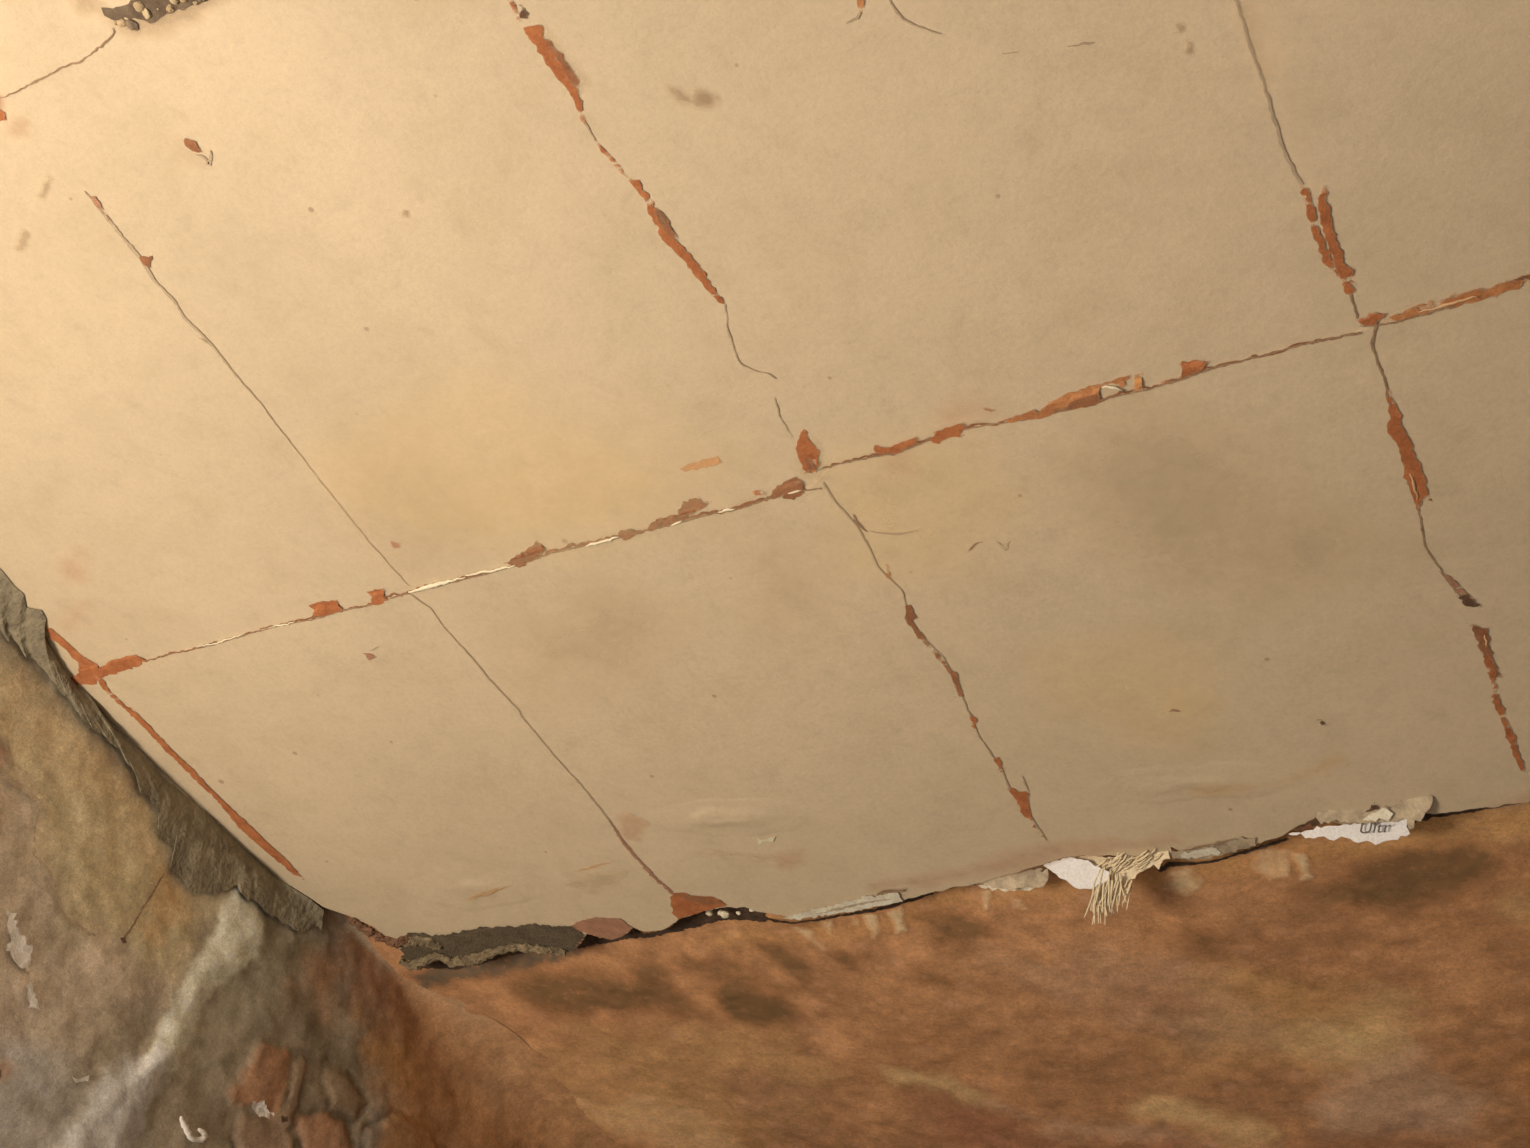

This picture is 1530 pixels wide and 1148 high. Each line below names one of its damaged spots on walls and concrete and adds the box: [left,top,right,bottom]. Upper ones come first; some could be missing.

spalling [0,0,206,121]
crack [46,0,1530,894]
crack [0,736,165,944]
flaking render [6,910,40,1010]
spalling [349,917,633,971]
peeling [670,893,725,919]